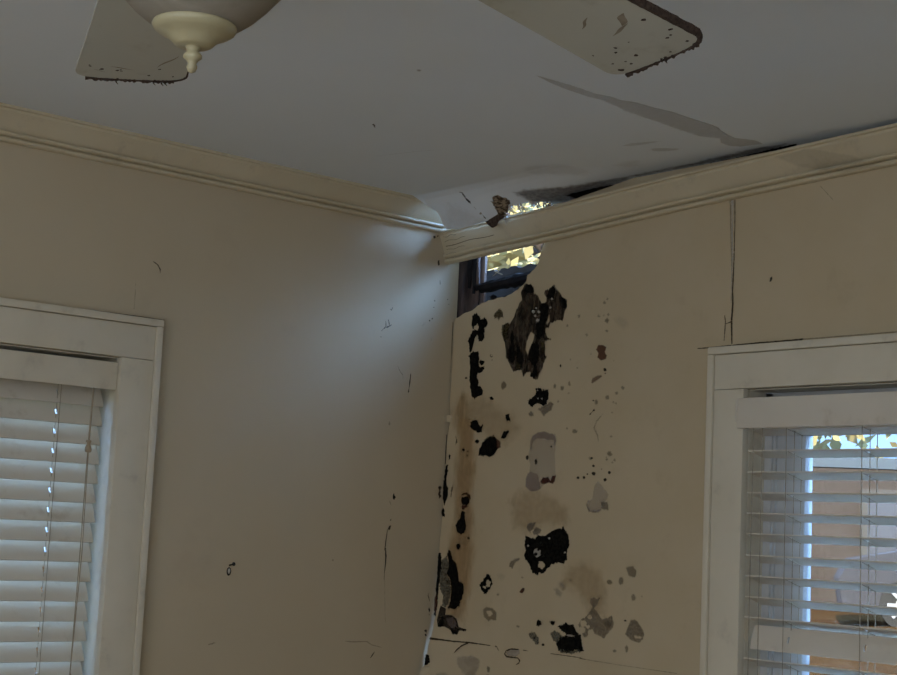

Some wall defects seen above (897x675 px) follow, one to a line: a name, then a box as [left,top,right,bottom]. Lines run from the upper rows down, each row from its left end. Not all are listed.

crack [698,204,803,349]
mould [465,283,567,416]
mould [456,414,510,457]
mould [428,487,471,635]
water stain [480,574,493,594]
mould [510,526,569,576]
mould [529,598,613,654]
mould [624,620,644,643]